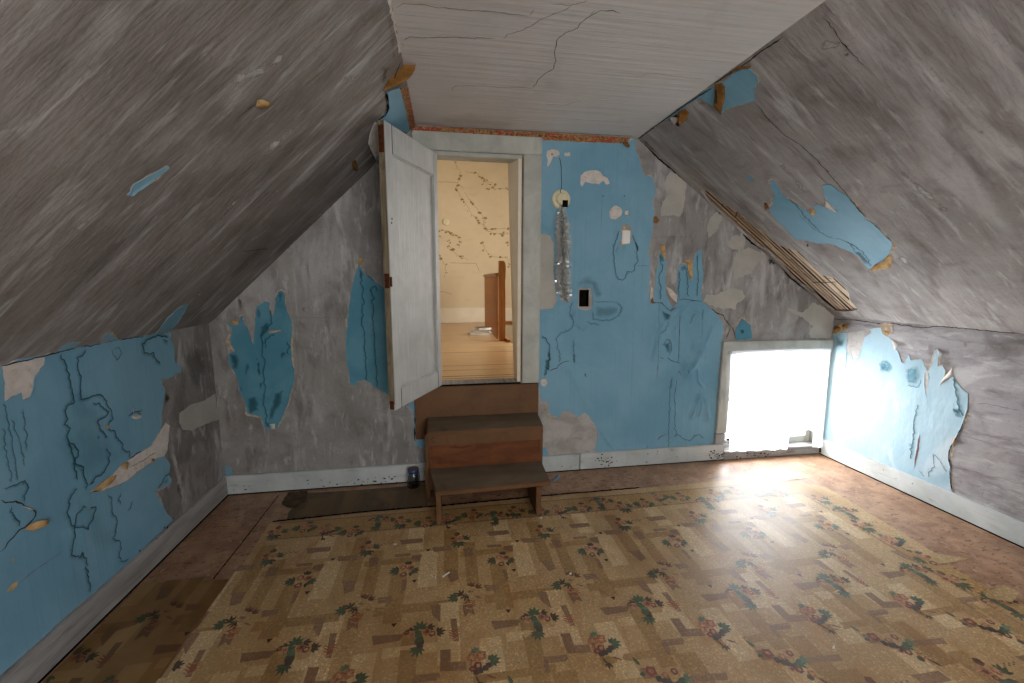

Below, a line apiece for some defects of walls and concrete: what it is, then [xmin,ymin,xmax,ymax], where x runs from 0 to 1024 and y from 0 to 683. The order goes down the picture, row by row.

crack [398,0,620,89]
peeling [871,255,893,271]
flaking render [833,322,898,360]
peeling [94,462,129,491]
peeling [22,506,49,531]